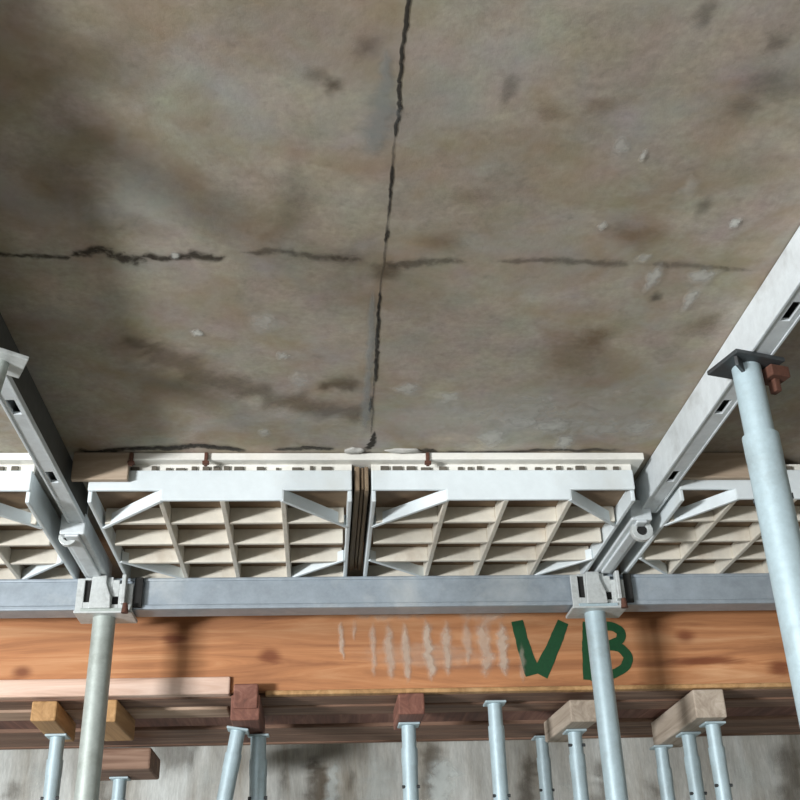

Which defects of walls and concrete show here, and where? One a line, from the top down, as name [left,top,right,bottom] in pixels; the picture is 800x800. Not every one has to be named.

crack [394,0,411,137]
crack [384,166,394,242]
crack [0,246,223,265]
crack [368,293,381,411]
crack [366,432,376,449]
leakage [424,626,435,674]
leakage [498,628,507,669]